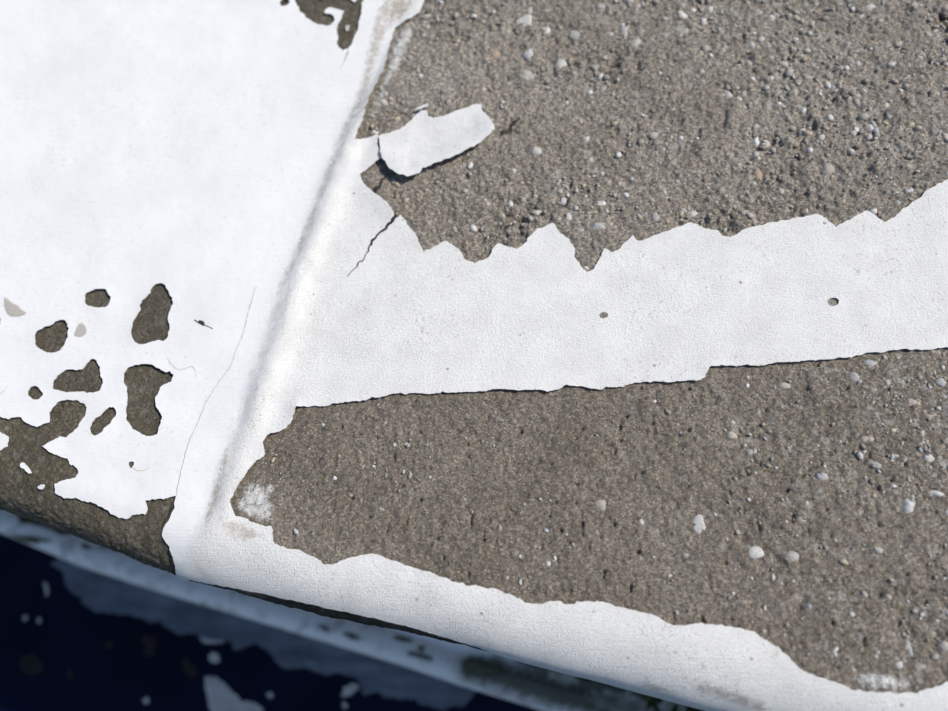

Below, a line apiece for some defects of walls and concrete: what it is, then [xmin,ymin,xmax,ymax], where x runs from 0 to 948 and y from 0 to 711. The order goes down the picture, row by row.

peeling [280,0,363,50]
crack [501,117,520,134]
spalling [355,0,948,272]
crack [373,174,389,192]
crack [348,214,398,275]
peeling [35,320,69,353]
peeling [85,289,111,308]
peeling [131,283,173,344]
peeling [0,359,176,575]
spalling [188,347,948,694]
peeling [204,676,273,711]
peeling [341,683,359,708]